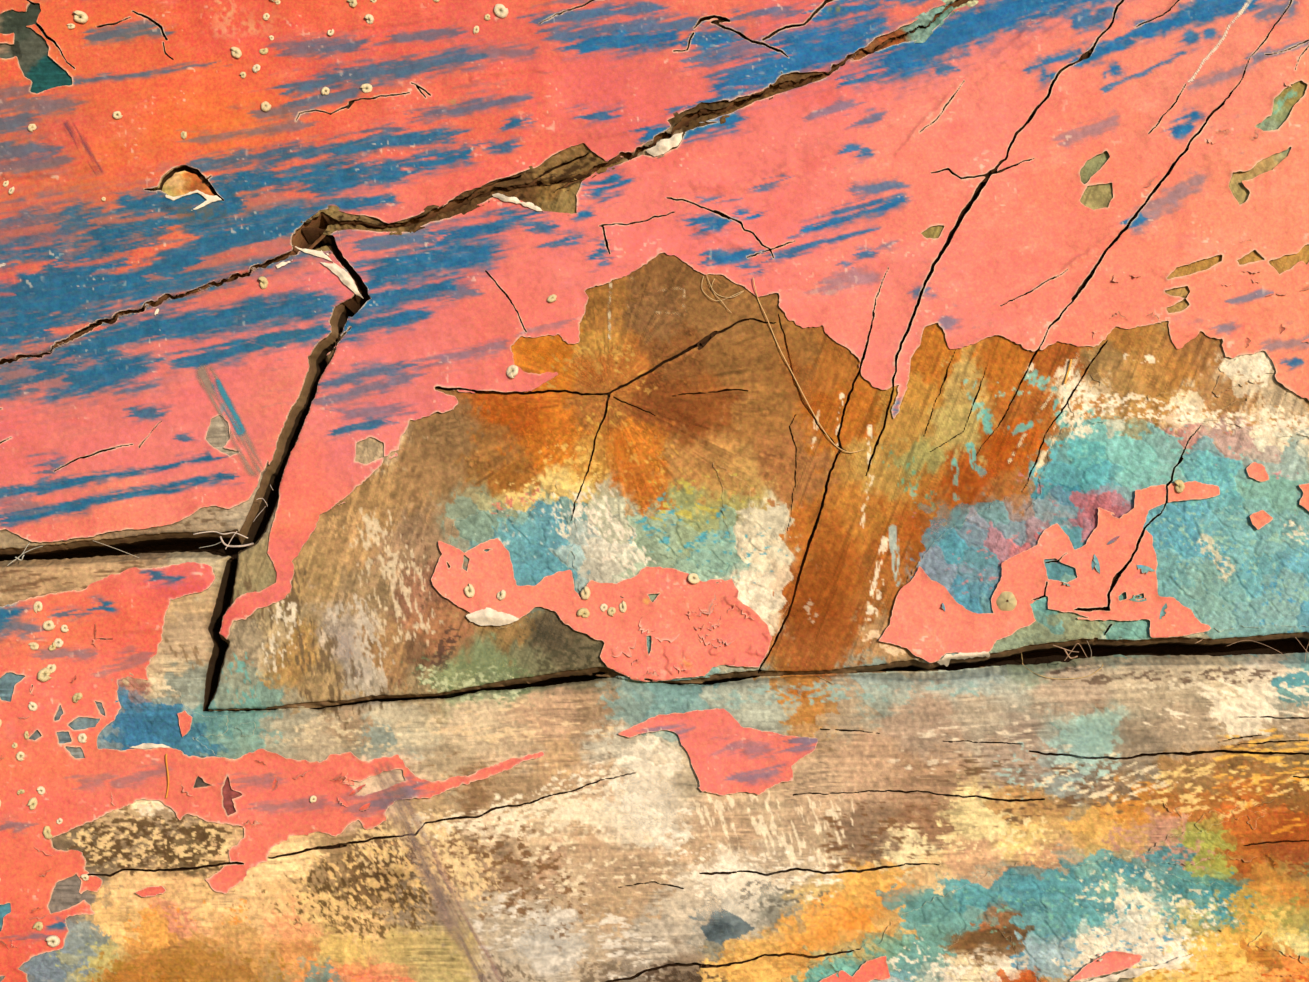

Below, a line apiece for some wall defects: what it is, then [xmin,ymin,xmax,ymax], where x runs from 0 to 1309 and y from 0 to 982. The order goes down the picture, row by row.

peeling [0,1,72,94]
crack [0,0,973,365]
crack [923,0,1309,455]
crack [437,0,1197,673]
crack [55,421,162,471]
peeling [0,239,1309,982]
crack [820,727,879,735]
crack [944,716,1309,778]
crack [793,790,1043,802]
crack [620,863,939,889]
crack [605,949,860,982]